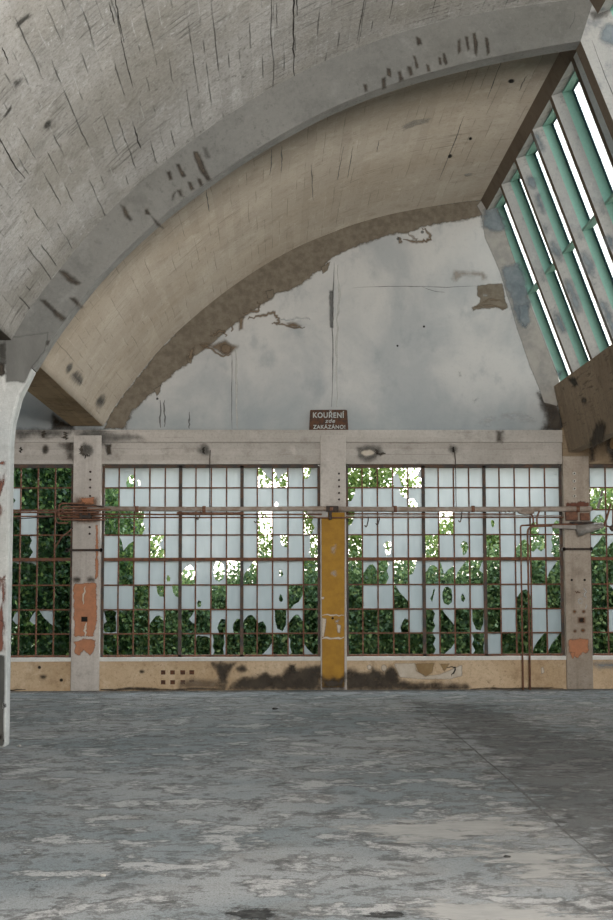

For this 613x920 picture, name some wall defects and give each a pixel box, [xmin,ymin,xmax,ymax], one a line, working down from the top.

crack [110,0,133,86]
crack [270,0,298,76]
damp [591,10,613,44]
crack [0,139,25,178]
flaking render [105,200,560,429]
damp [503,263,530,327]
damp [590,421,613,462]
peeling [73,583,97,655]
damp [101,663,563,691]